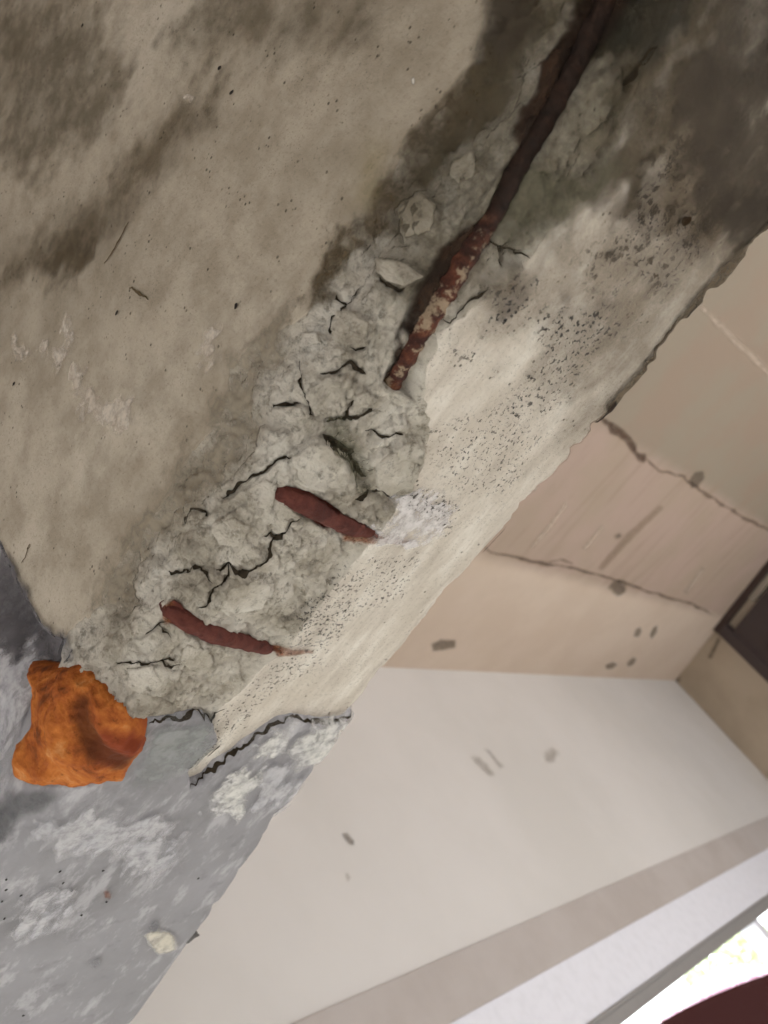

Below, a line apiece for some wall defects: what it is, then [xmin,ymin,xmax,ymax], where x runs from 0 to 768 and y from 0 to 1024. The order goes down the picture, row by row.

leakage [310,0,586,307]
rust [504,0,595,171]
leakage [500,0,768,410]
spalling [0,0,643,788]
crack [273,276,405,501]
rust [385,220,480,379]
leakage [429,276,621,493]
crack [168,519,300,608]
crack [184,456,292,524]
rust [285,486,346,516]
rust [270,645,311,657]
crack [149,709,352,787]